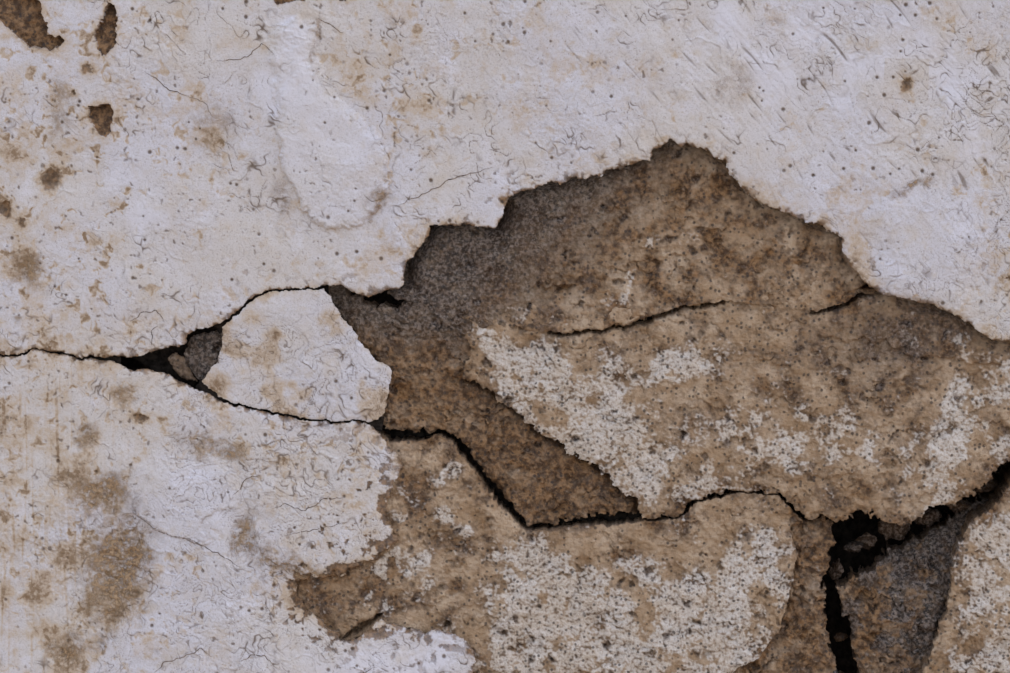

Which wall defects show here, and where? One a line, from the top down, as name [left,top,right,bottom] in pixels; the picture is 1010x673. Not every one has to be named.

flaking render [0,0,64,52]
flaking render [93,2,118,56]
crack [0,284,728,527]
spalling [127,139,1010,673]
crack [133,512,239,567]
crack [275,498,344,536]
crack [760,489,805,517]
crack [822,466,1001,673]